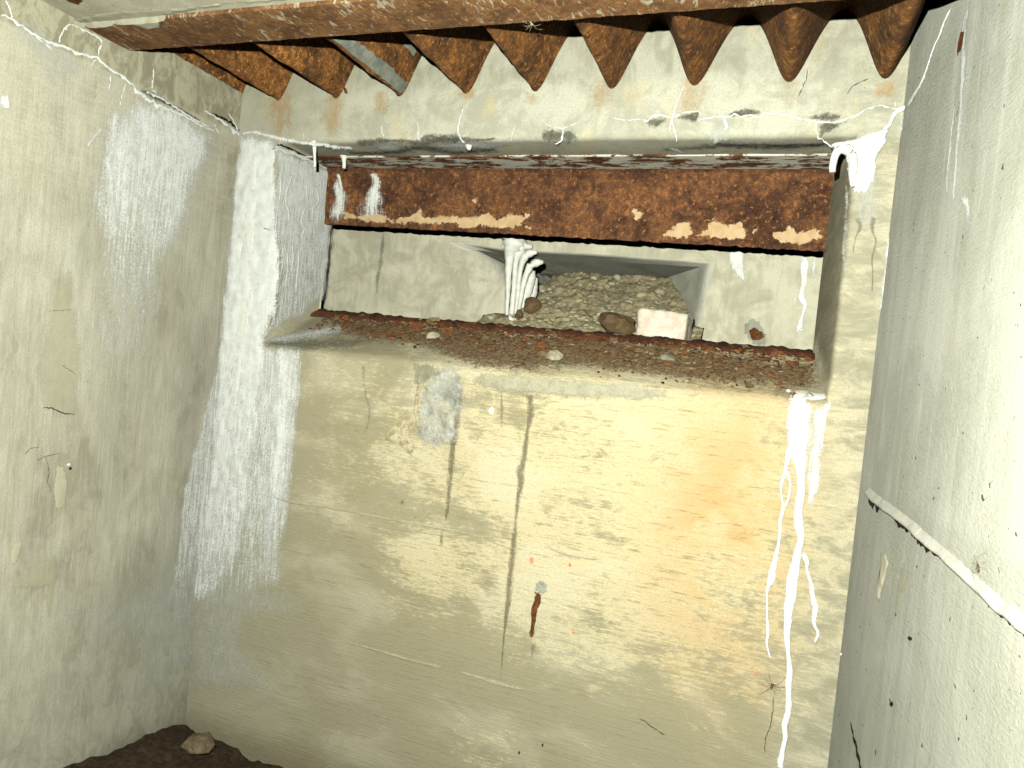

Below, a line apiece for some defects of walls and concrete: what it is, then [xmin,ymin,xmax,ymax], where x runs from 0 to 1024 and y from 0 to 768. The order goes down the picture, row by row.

crack [1,1,240,135]
crack [603,69,897,147]
water stain [666,7,952,193]
water stain [87,96,211,366]
water stain [169,131,504,617]
corrosion [749,328,764,340]
water stain [793,254,819,337]
water stain [501,396,533,665]
corrosion [529,592,541,650]
water stain [765,392,831,768]